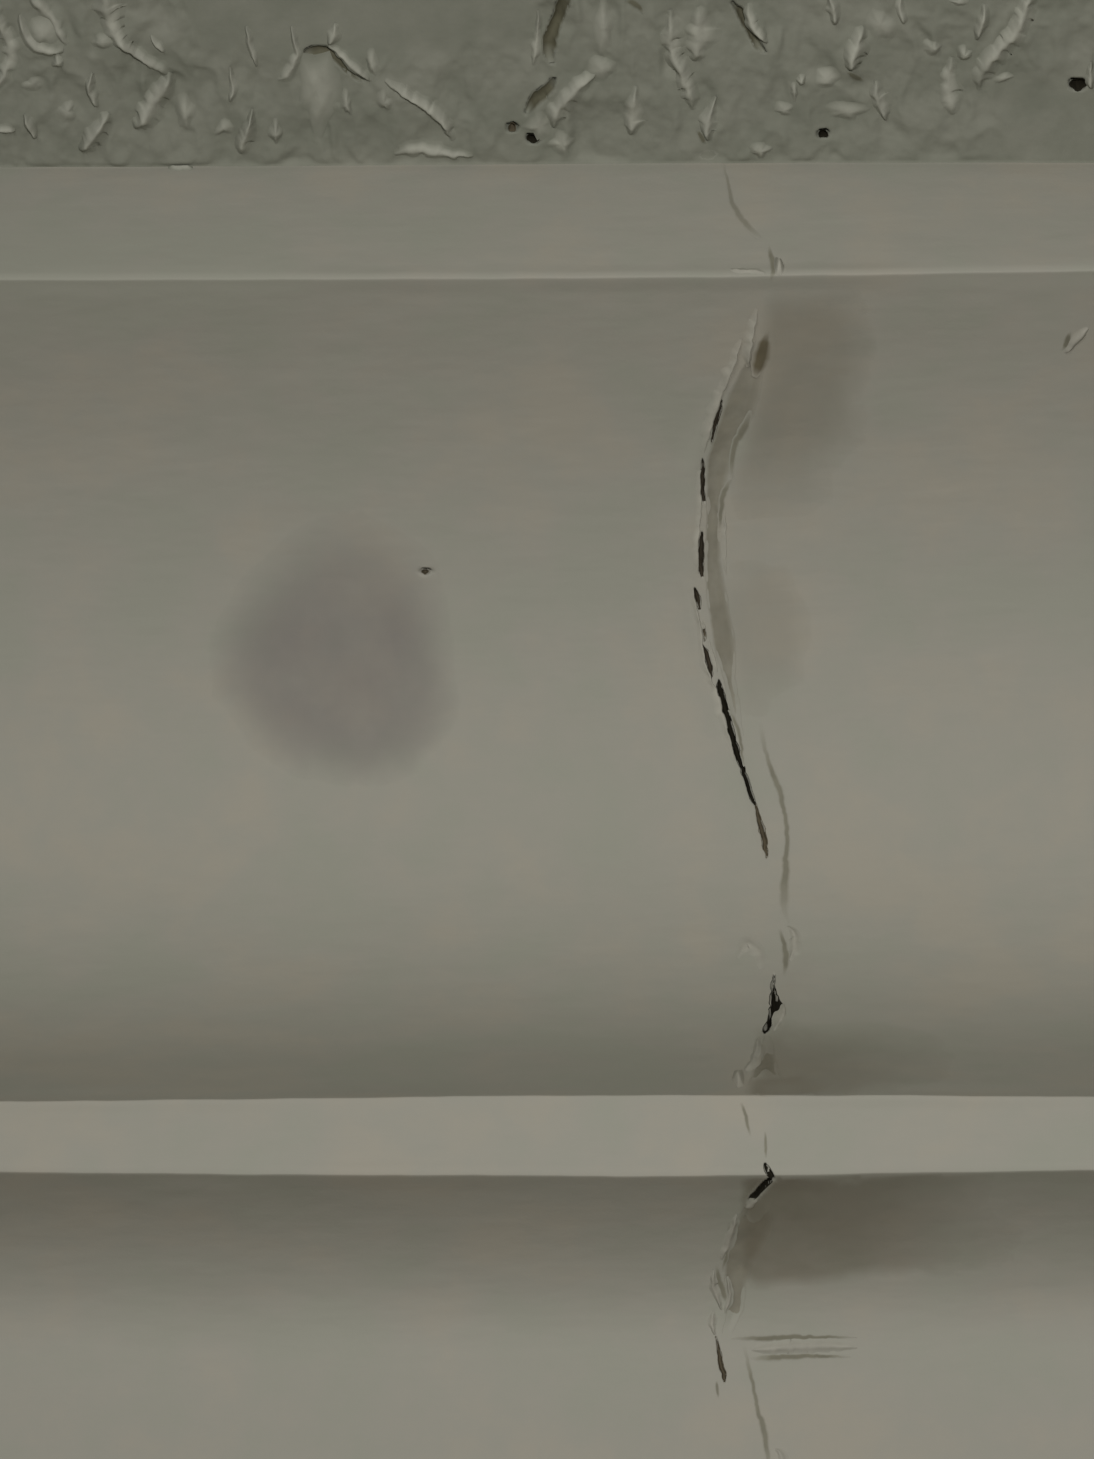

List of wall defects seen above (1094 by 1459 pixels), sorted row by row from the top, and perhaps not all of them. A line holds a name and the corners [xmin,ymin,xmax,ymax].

peeling [0,0,69,91]
peeling [56,72,113,155]
peeling [91,0,196,130]
peeling [214,66,283,155]
peeling [277,23,473,160]
peeling [509,0,644,155]
peeling [659,5,723,161]
peeling [731,2,769,54]
peeling [773,0,908,137]
peeling [922,0,1038,115]
peeling [1069,61,1094,92]
crack [690,163,803,1459]